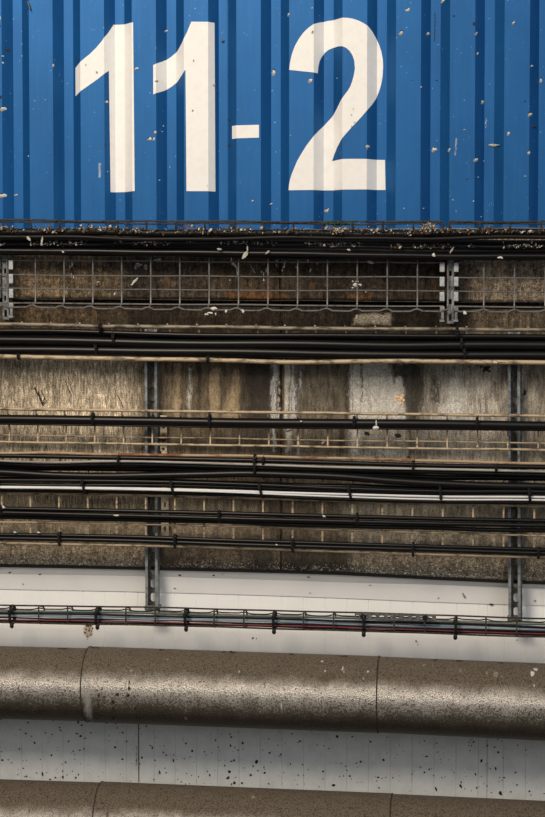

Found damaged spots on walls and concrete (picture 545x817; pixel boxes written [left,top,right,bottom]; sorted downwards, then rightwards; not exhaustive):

damp [172,359,302,419]
damp [272,429,300,453]